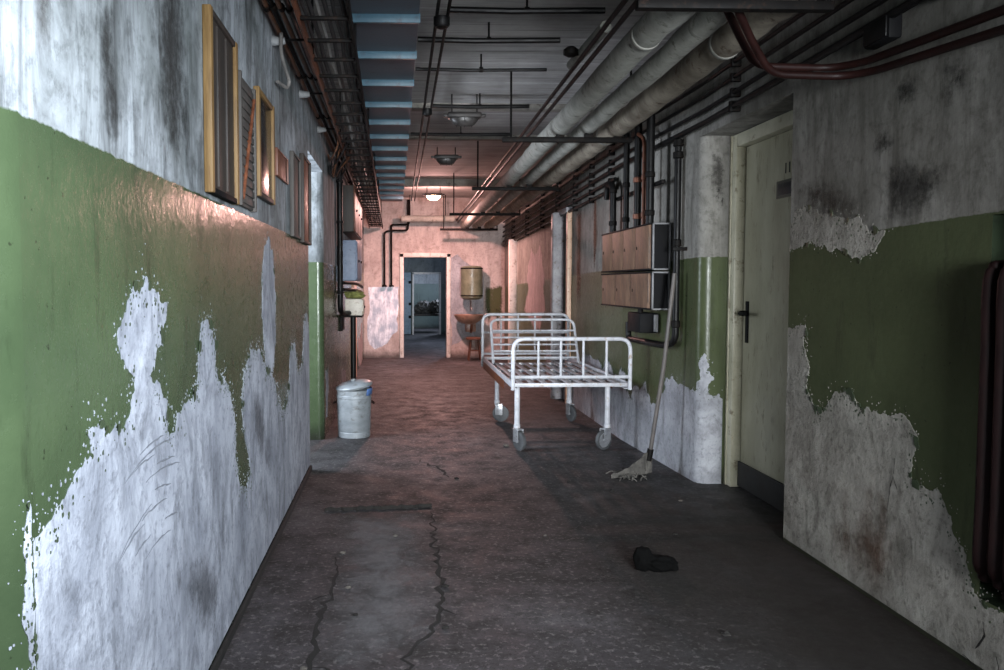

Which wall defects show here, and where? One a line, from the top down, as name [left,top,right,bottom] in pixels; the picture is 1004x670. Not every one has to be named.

leakage [103,15,117,134]
leakage [159,0,181,140]
peeling [524,245,546,330]
peeling [790,192,893,264]
peeling [8,236,310,670]
peeling [563,353,723,484]
peeling [783,314,1004,670]
crack [305,557,339,670]
crack [400,513,457,670]